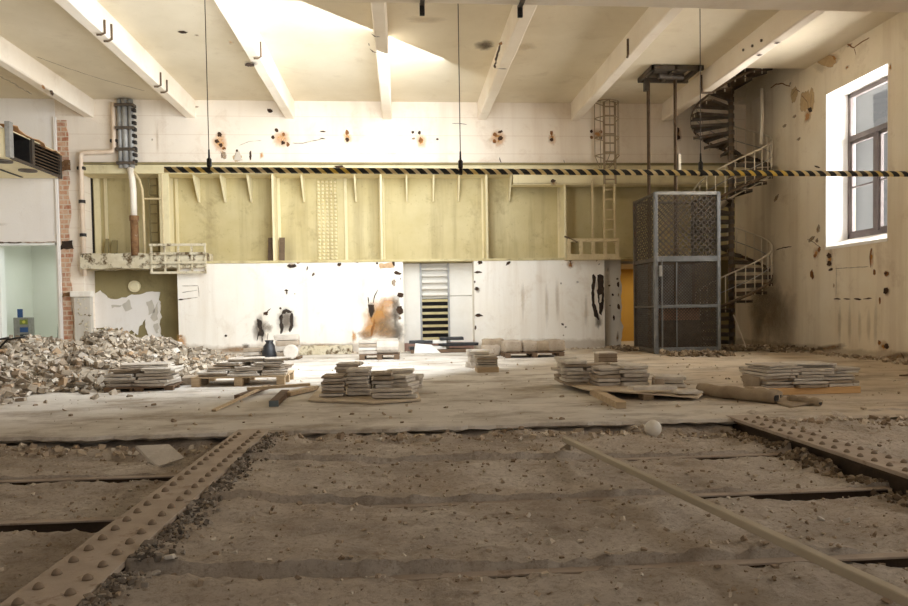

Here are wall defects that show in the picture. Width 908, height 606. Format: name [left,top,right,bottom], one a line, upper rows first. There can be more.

peeling [783,86,814,128]
peeling [95,290,162,337]
leakage [257,309,293,341]
rust [353,300,401,340]